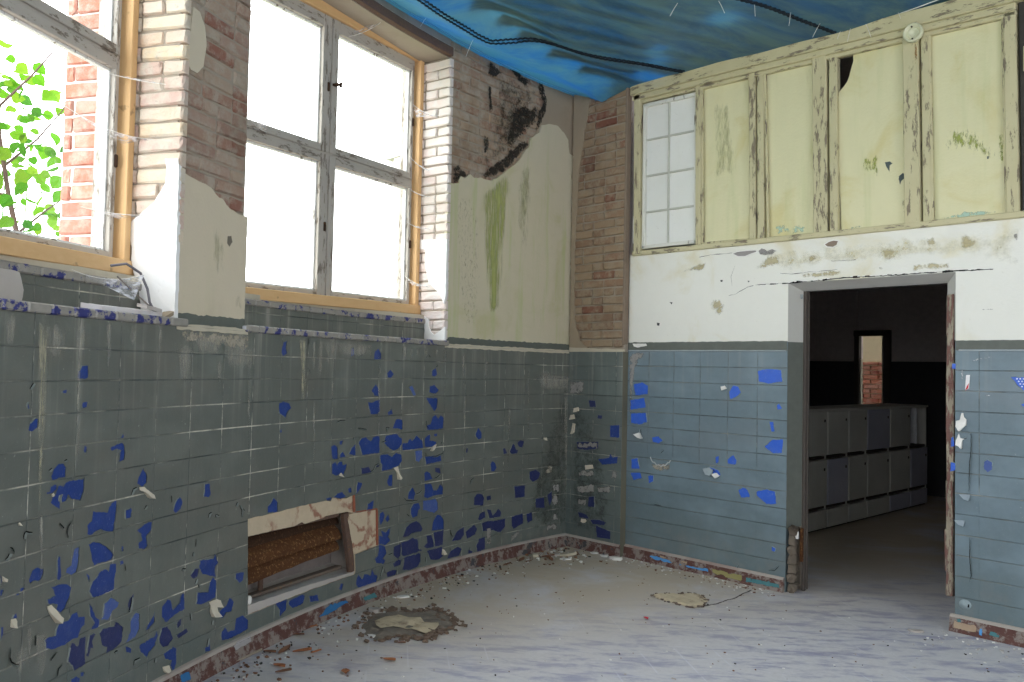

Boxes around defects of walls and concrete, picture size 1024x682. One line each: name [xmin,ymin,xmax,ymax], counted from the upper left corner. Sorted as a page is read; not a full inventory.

spalling [131,0,251,245]
damp [483,62,547,179]
damp [453,166,468,183]
spalling [419,41,546,339]
peeling [758,369,783,384]
peeling [765,422,783,453]
peeling [951,413,967,449]
peeling [47,459,85,509]
peeling [248,365,552,587]
peeling [738,487,776,504]
peeling [0,501,249,682]
peeling [276,595,319,617]